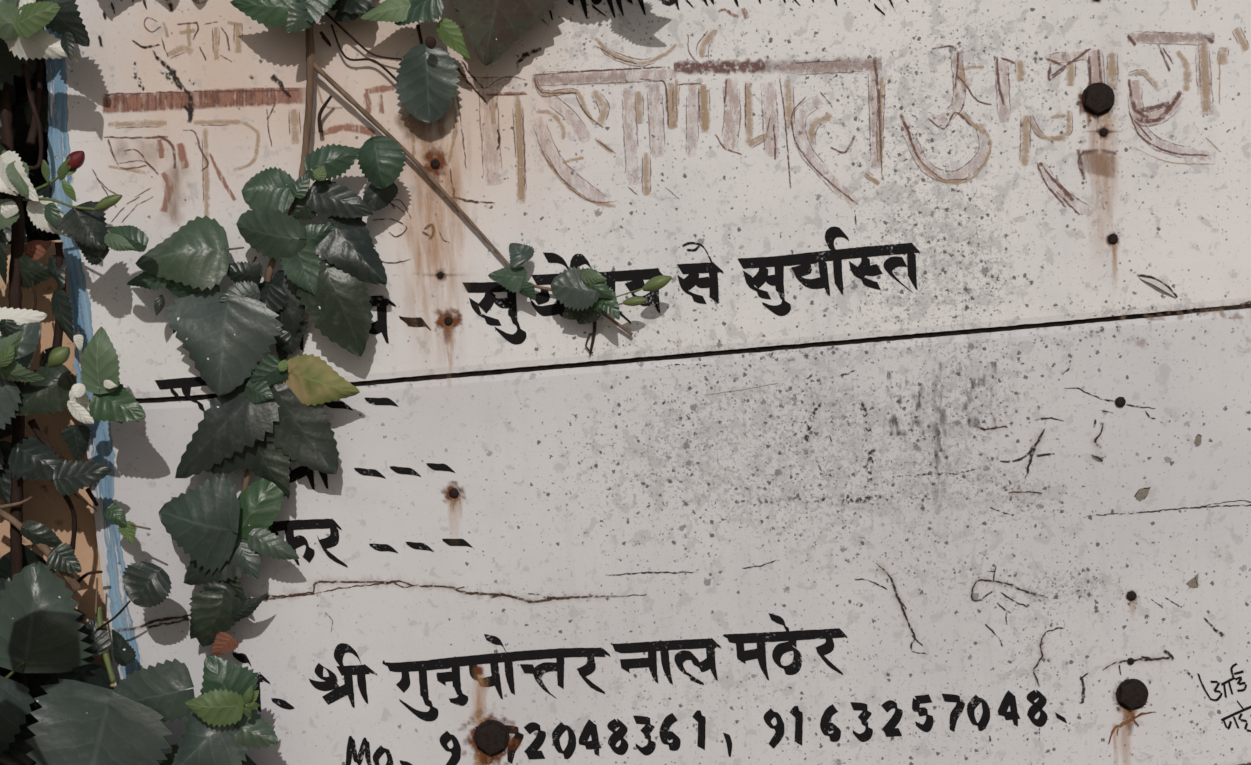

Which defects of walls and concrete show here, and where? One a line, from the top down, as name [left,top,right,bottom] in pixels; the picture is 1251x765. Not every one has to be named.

rust [398,114,447,184]
rust [436,310,461,339]
rust [444,481,463,503]
crack [1092,500,1251,516]
crack [249,580,647,603]
crack [125,614,190,630]
crack [855,566,926,654]
rust [468,666,519,765]